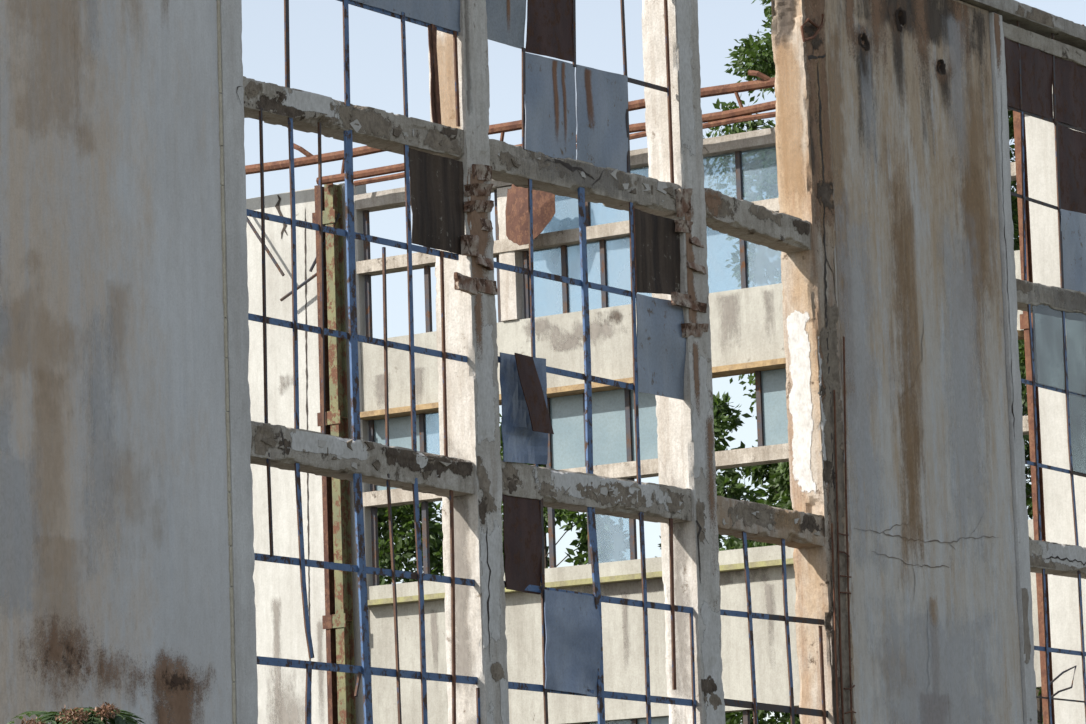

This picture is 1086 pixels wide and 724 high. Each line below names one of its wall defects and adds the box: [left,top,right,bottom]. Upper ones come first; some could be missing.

spalling [244,81,462,155]
rust [467,171,490,280]
peeling [606,169,676,202]
rust [705,190,722,217]
spalling [748,204,810,235]
rust [474,292,483,349]
rust [894,214,920,541]
peeling [251,324,706,648]
spalling [722,302,856,724]
crack [853,513,999,695]
rust [20,615,211,724]
peeling [484,662,509,724]